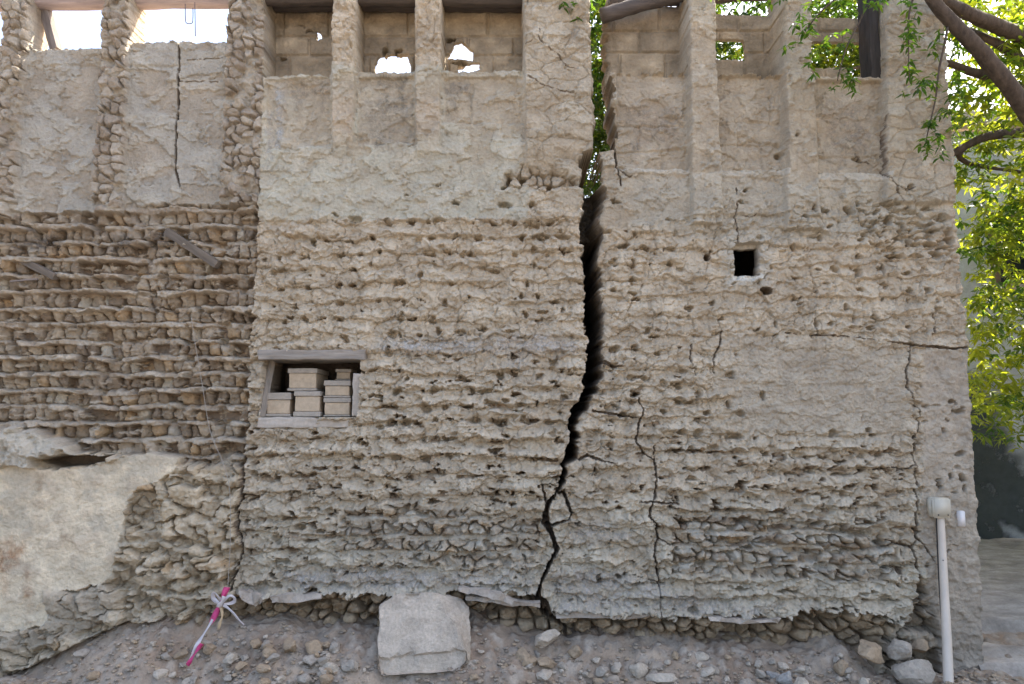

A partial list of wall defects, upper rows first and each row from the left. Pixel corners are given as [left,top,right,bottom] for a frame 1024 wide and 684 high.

crack [174,42,222,188]
spalling [0,200,387,633]
crack [525,0,680,628]
crack [785,313,969,618]
spalling [458,582,940,675]